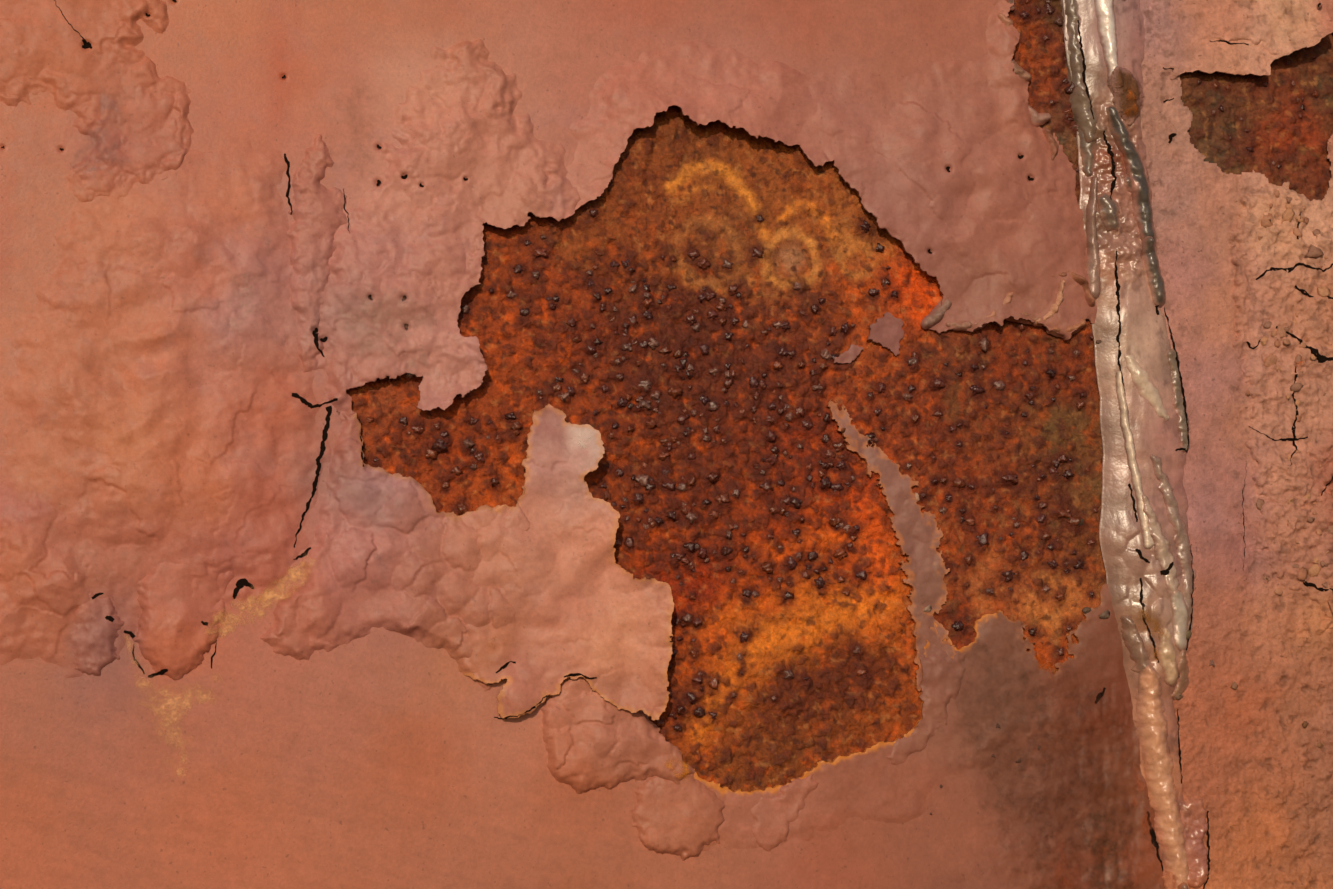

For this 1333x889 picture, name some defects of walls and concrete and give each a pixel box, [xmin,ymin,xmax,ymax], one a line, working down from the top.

crack [284,154,293,215]
rust [1008,0,1080,205]
rust [1180,32,1333,201]
crack [1256,213,1333,299]
crack [312,333,325,357]
crack [292,393,364,560]
peeling [259,0,1097,720]
rust [337,106,1106,792]
crack [1246,326,1333,466]
crack [233,578,254,599]
peeling [694,399,1135,851]
crack [1300,580,1333,592]